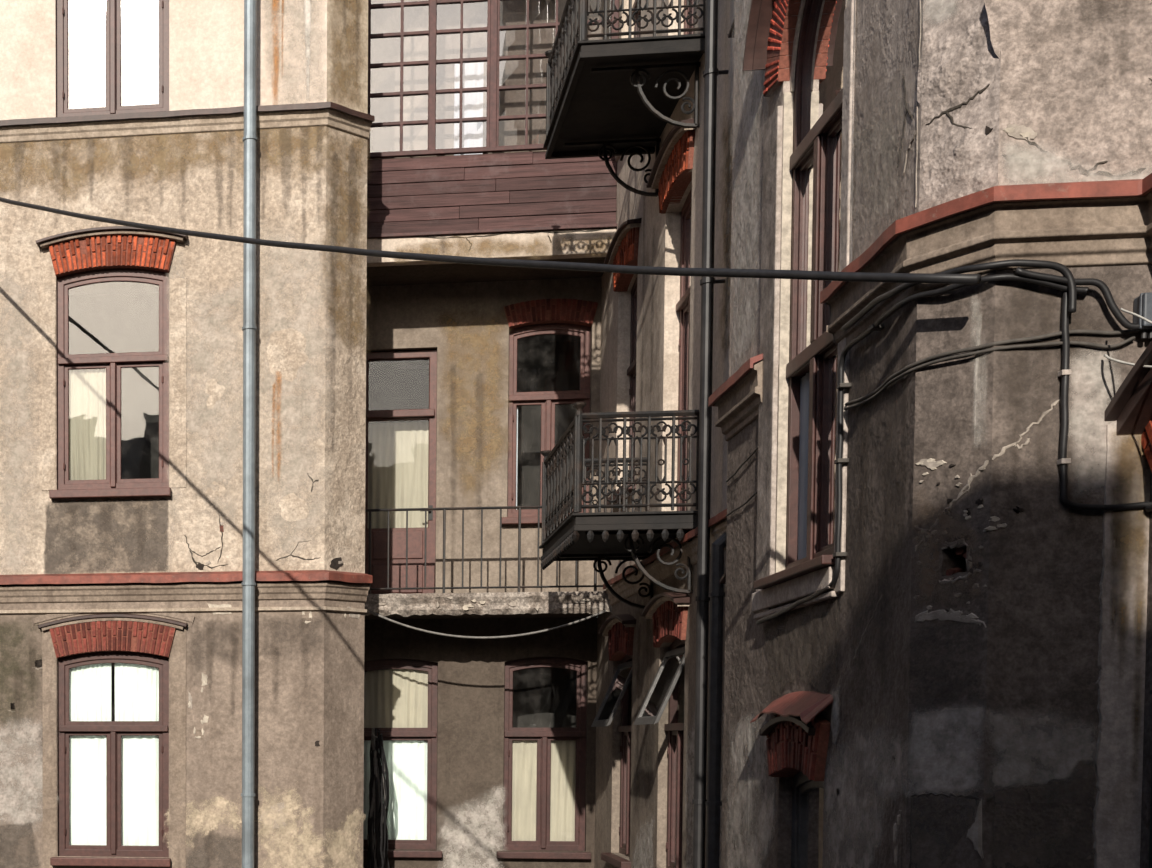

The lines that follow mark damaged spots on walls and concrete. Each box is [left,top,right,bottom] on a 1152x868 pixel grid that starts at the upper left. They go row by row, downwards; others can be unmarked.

corrosion [273,0,284,91]
crack [897,0,990,208]
water stain [0,126,364,344]
peeling [915,458,947,476]
crack [914,399,1060,551]
crack [184,515,228,569]
crack [276,540,321,561]
peeling [915,608,986,628]
peeling [825,707,1093,868]